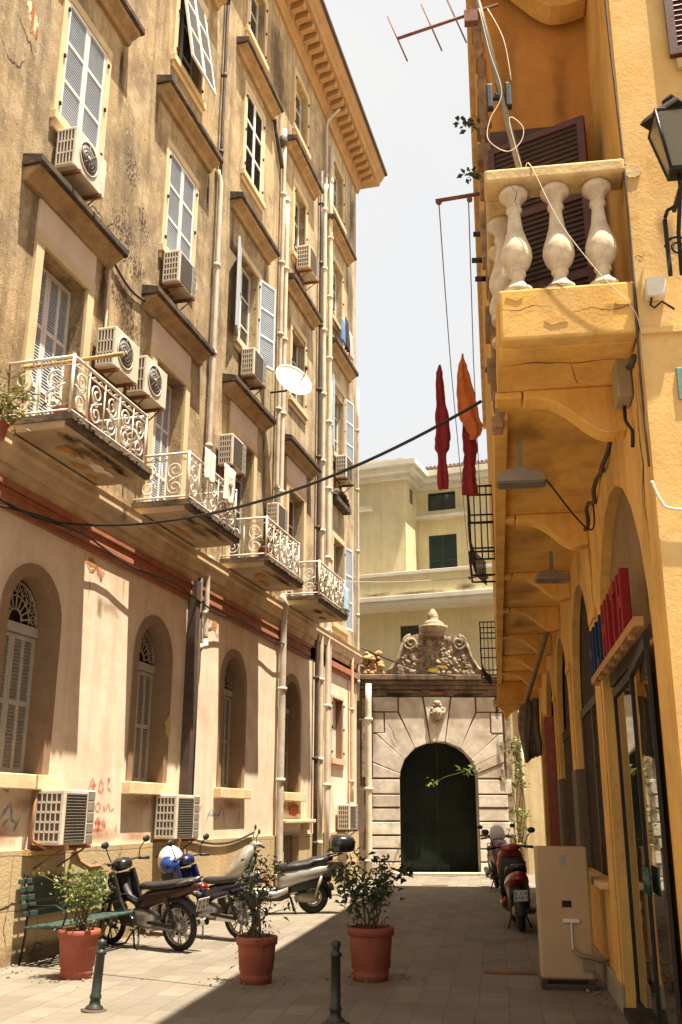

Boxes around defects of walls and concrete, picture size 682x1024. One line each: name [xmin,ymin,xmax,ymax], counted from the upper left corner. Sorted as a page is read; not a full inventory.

crack [0,18,35,67]
crack [502,283,628,312]
crack [512,358,651,563]